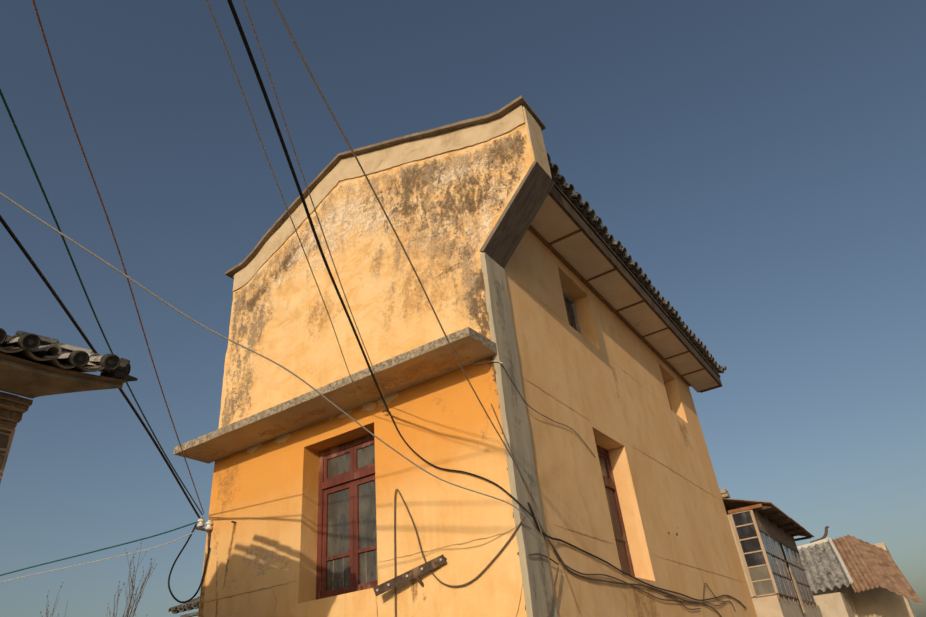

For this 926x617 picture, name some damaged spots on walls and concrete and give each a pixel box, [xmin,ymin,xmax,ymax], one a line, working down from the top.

leakage [222,131,525,427]